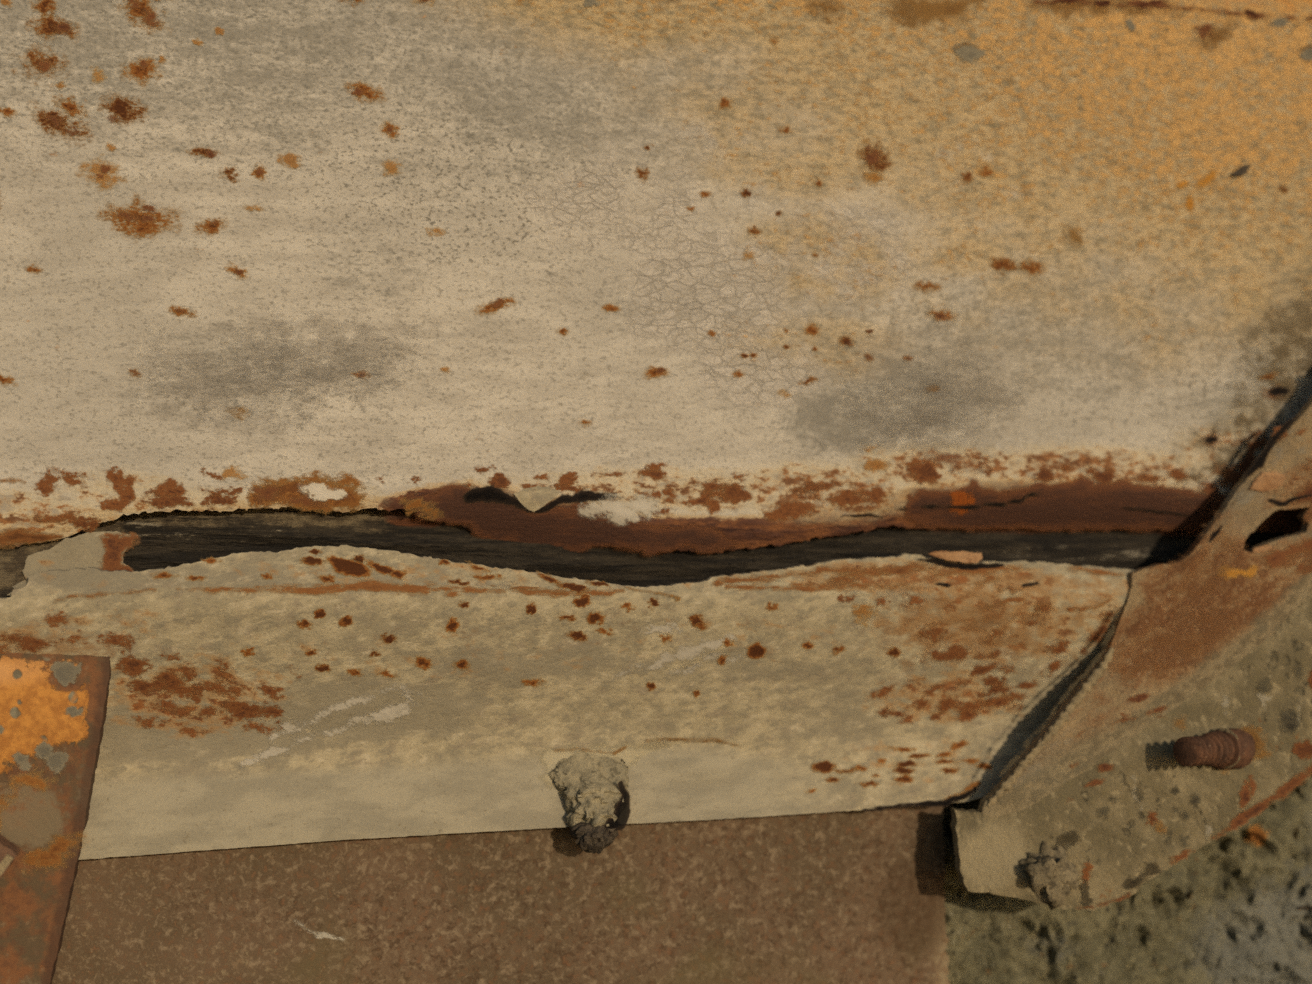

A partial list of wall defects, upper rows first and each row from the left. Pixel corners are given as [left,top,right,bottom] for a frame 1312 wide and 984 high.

corrosion [13,0,92,140]
corrosion [101,56,165,123]
corrosion [0,466,365,548]
peeling [514,486,560,512]
corrosion [401,462,752,556]
peeling [578,494,660,526]
corrosion [763,426,1312,532]
peeling [7,531,140,595]
corrosion [714,551,1052,626]
corrosion [0,549,659,738]
corrosion [871,599,1116,724]
corrosion [809,740,992,793]